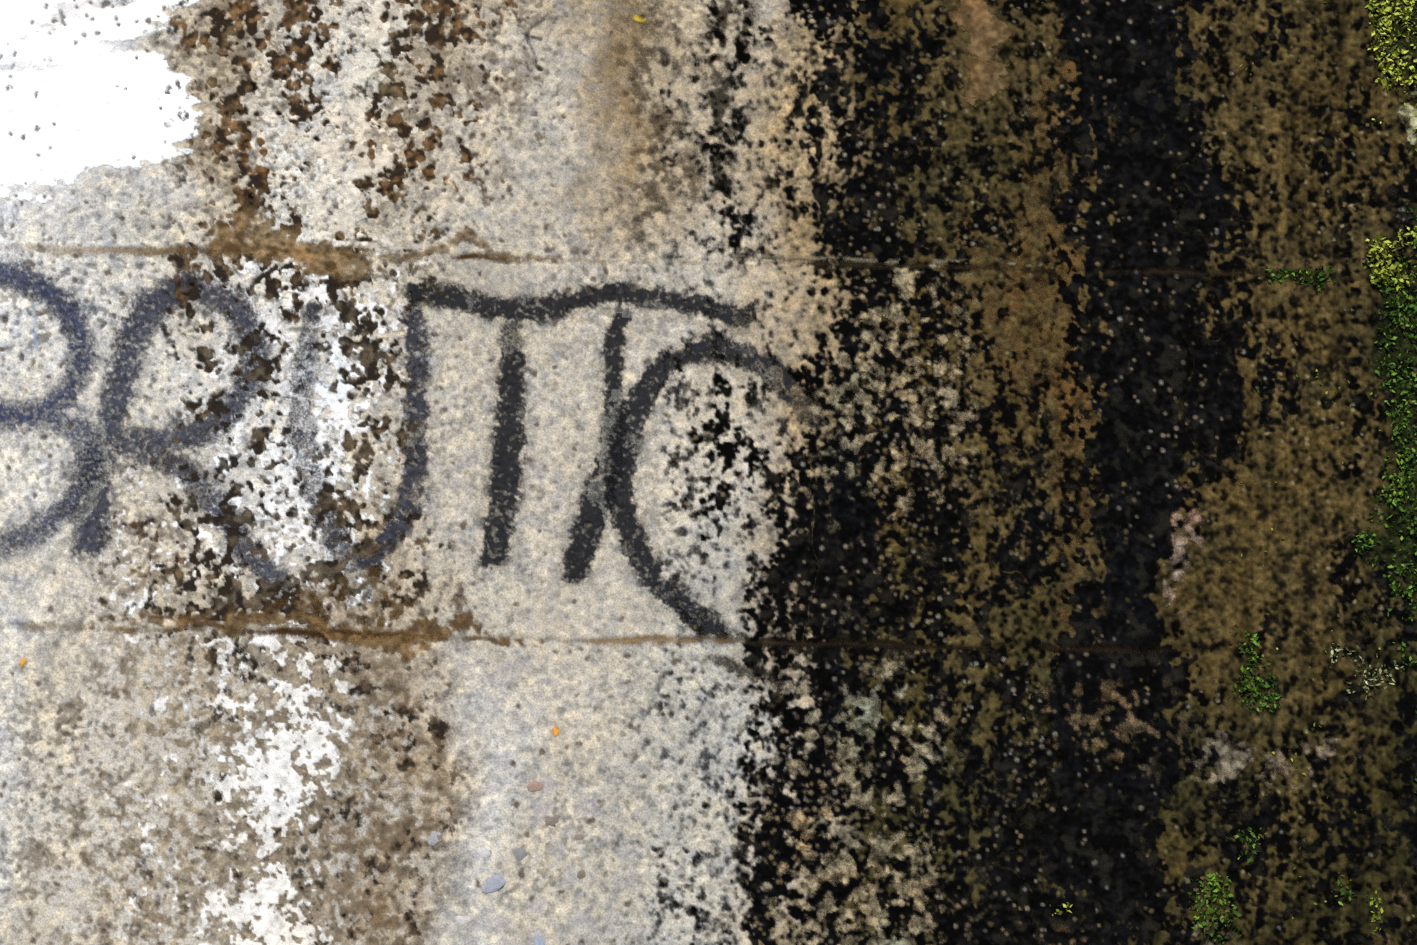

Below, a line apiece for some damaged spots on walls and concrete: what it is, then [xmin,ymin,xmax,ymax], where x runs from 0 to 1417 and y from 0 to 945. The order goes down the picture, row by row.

rust [185,205,530,282]
rust [92,567,523,663]
leakage [708,656,789,688]
leakage [696,626,809,661]